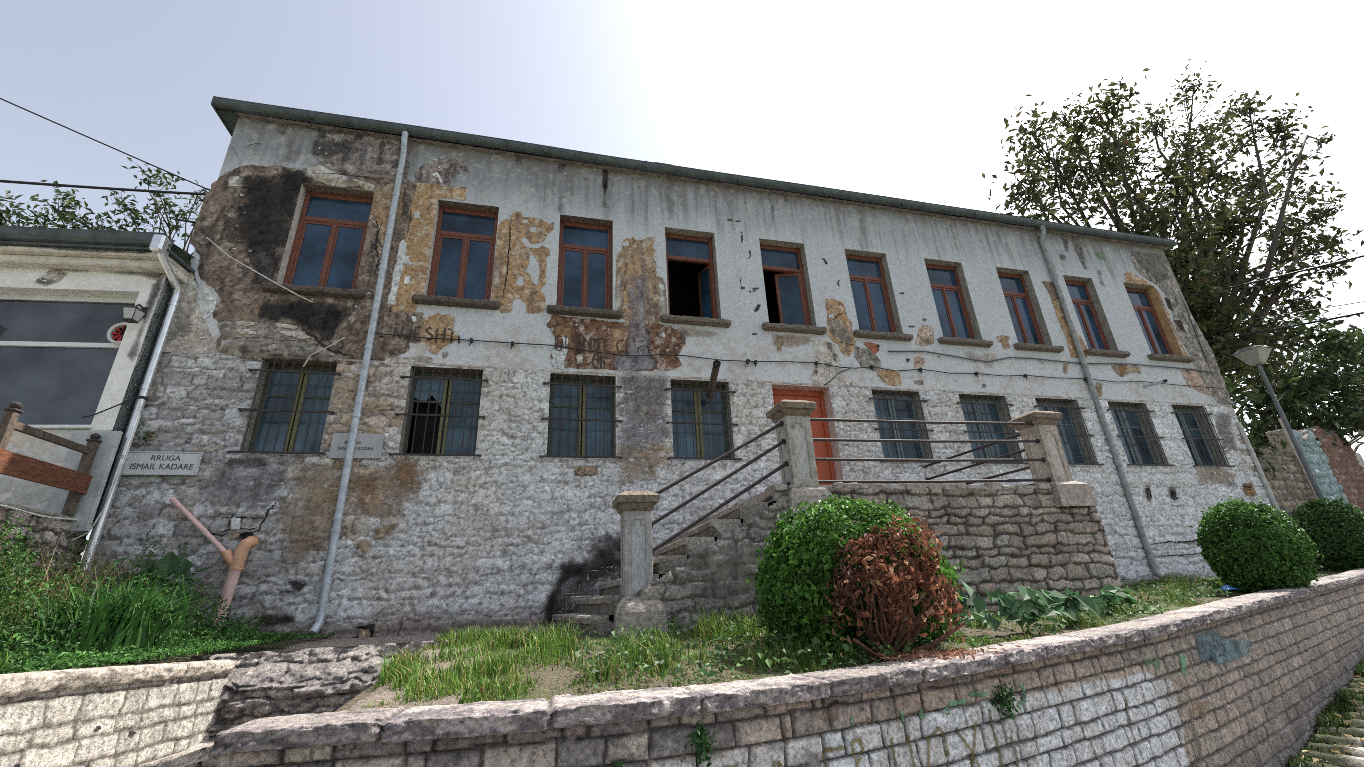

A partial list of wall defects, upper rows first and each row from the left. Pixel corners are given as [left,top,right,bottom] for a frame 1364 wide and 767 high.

leakage [237,122,413,282]
leakage [320,311,339,340]
peeling [491,211,554,313]
peeling [615,237,668,338]
peeling [811,280,940,386]
leakage [545,537,621,625]